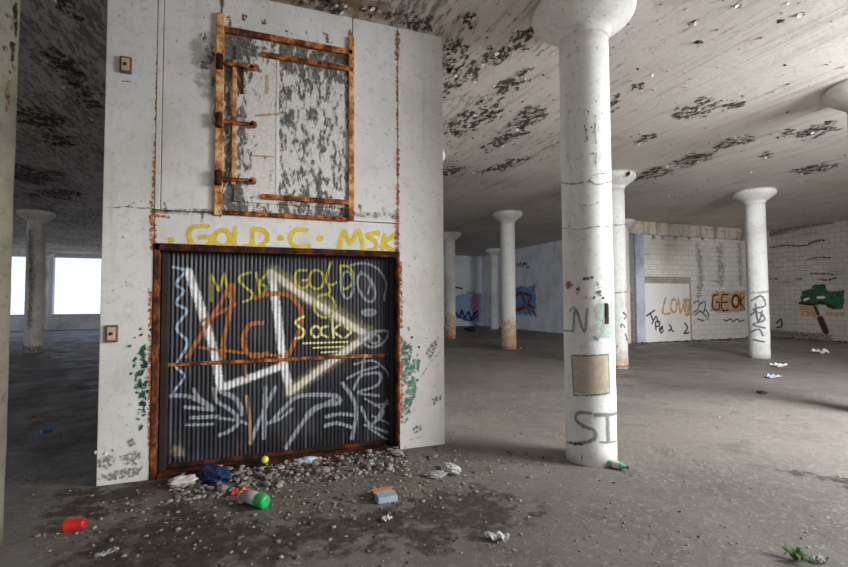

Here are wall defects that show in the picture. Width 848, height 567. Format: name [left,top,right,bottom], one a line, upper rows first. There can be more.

peeling [443,0,477,29]
peeling [442,27,557,153]
peeling [671,95,746,120]
peeling [764,116,842,141]
peeling [443,154,541,183]
peeling [626,128,755,190]
peeling [788,163,839,185]
corrosion [149,133,171,250]
corrosion [502,322,516,349]